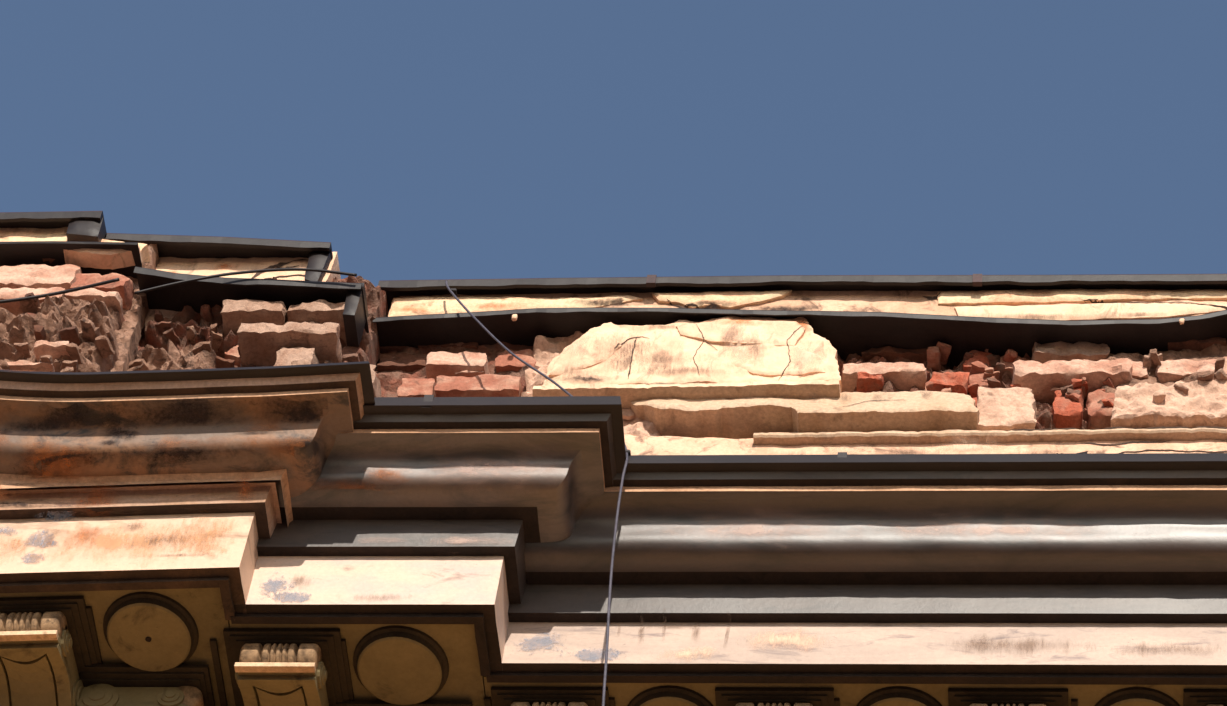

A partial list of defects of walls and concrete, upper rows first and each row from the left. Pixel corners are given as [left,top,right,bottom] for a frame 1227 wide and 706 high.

spalling [0,244,263,372]
flaking render [937,289,1227,321]
crack [664,291,717,373]
crack [614,336,647,378]
spalling [837,337,1227,431]
leakage [16,403,89,431]
leakage [103,398,212,444]
leakage [267,399,322,422]
leakage [24,451,91,474]
leakage [153,447,203,464]
crack [1009,426,1227,453]